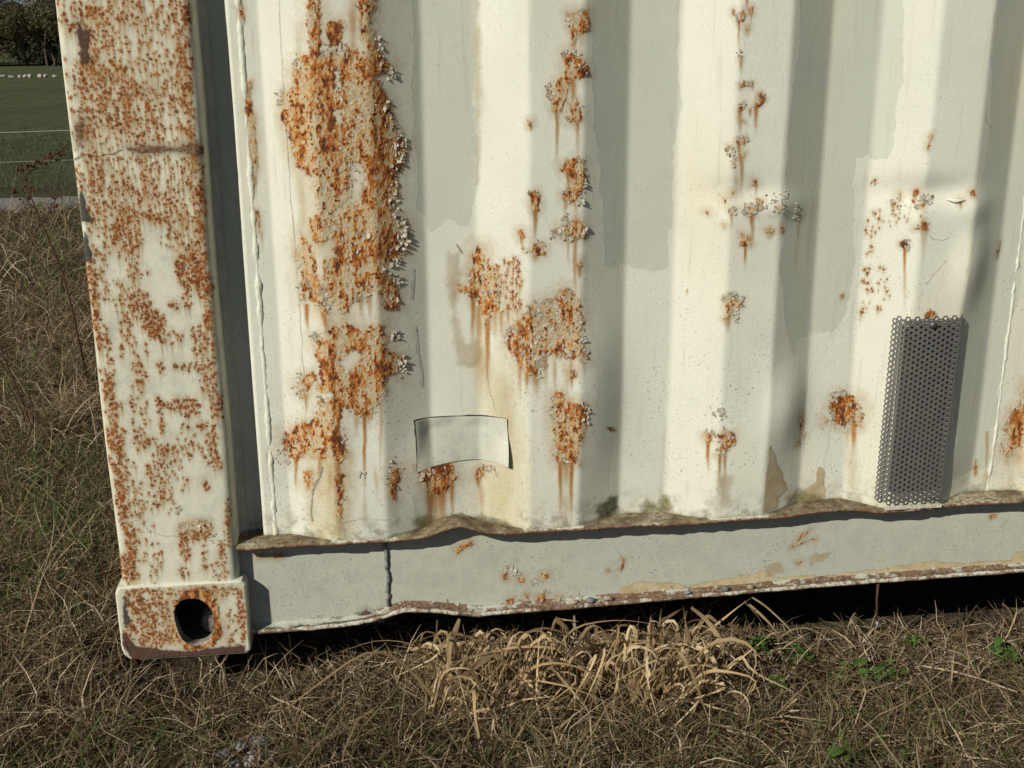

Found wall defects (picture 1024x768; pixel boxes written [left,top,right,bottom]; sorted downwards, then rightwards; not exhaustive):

rust [544,8,590,142]
rust [560,155,587,207]
rust [274,0,411,521]
rust [457,189,590,384]
rust [416,462,458,515]
rust [547,391,591,501]
rust [703,407,736,473]
peeling [763,446,826,513]
rust [824,389,865,445]
rust [986,384,1024,457]
peeling [620,552,1024,594]
rust [168,587,222,652]